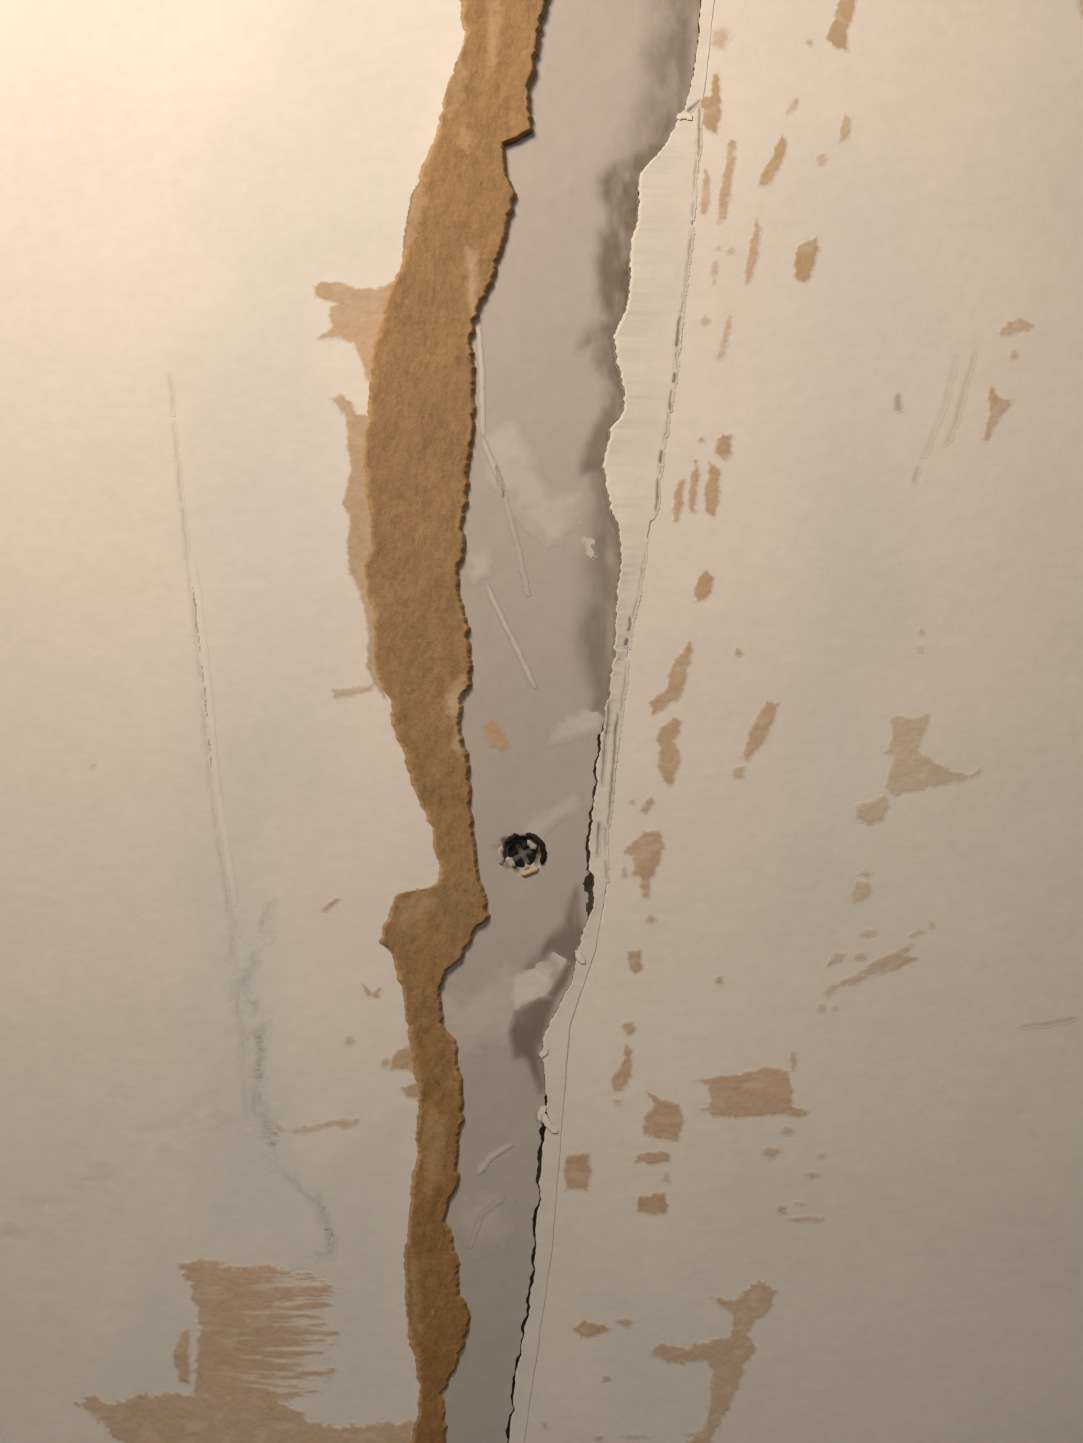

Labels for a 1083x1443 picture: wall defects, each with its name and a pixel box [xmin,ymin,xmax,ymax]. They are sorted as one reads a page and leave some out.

peeling [803,0,857,52]
peeling [71,0,737,1443]
peeling [853,712,983,827]
peeling [609,1019,810,1217]
peeling [648,1278,778,1443]